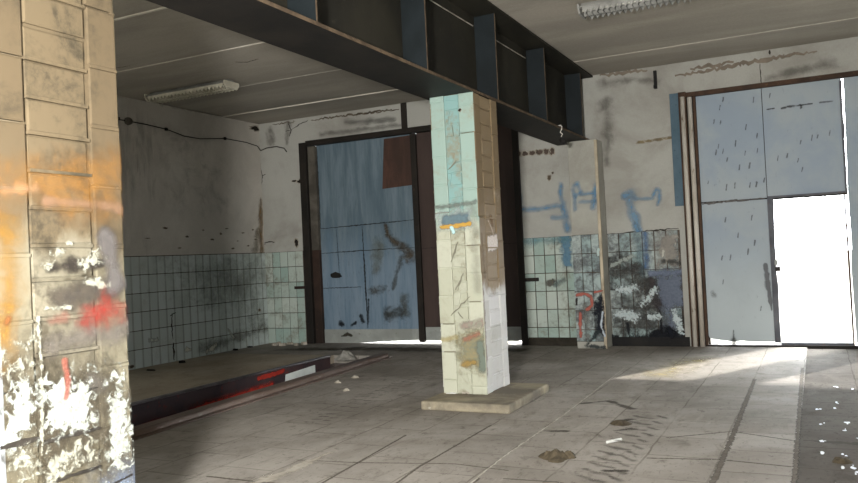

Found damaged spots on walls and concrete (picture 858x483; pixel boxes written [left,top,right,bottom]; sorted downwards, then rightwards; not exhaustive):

spalling [675,51,817,77]
peeling [44,241,73,271]
peeling [77,247,110,289]
peeling [0,305,345,483]